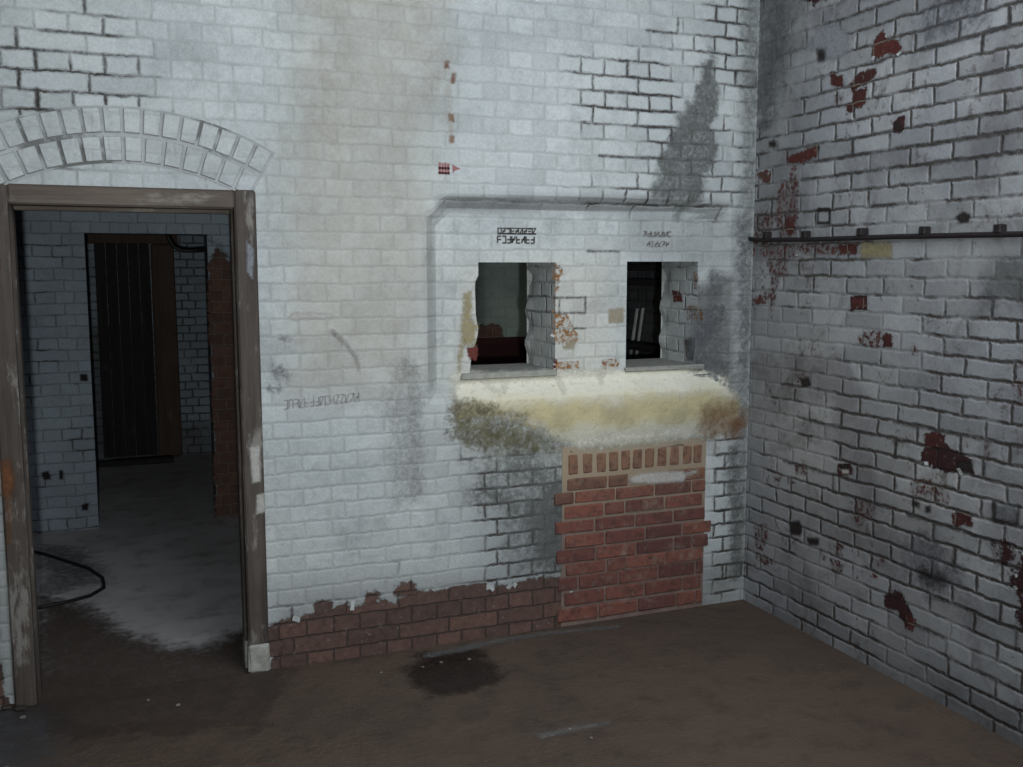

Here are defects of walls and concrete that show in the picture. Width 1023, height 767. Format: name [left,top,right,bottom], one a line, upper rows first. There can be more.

spalling [830,30,902,115]
water stain [654,61,719,199]
water stain [455,400,565,454]
spalling [910,431,974,528]
peeling [268,576,573,669]
spalling [884,590,916,632]
spalling [990,501,1023,631]